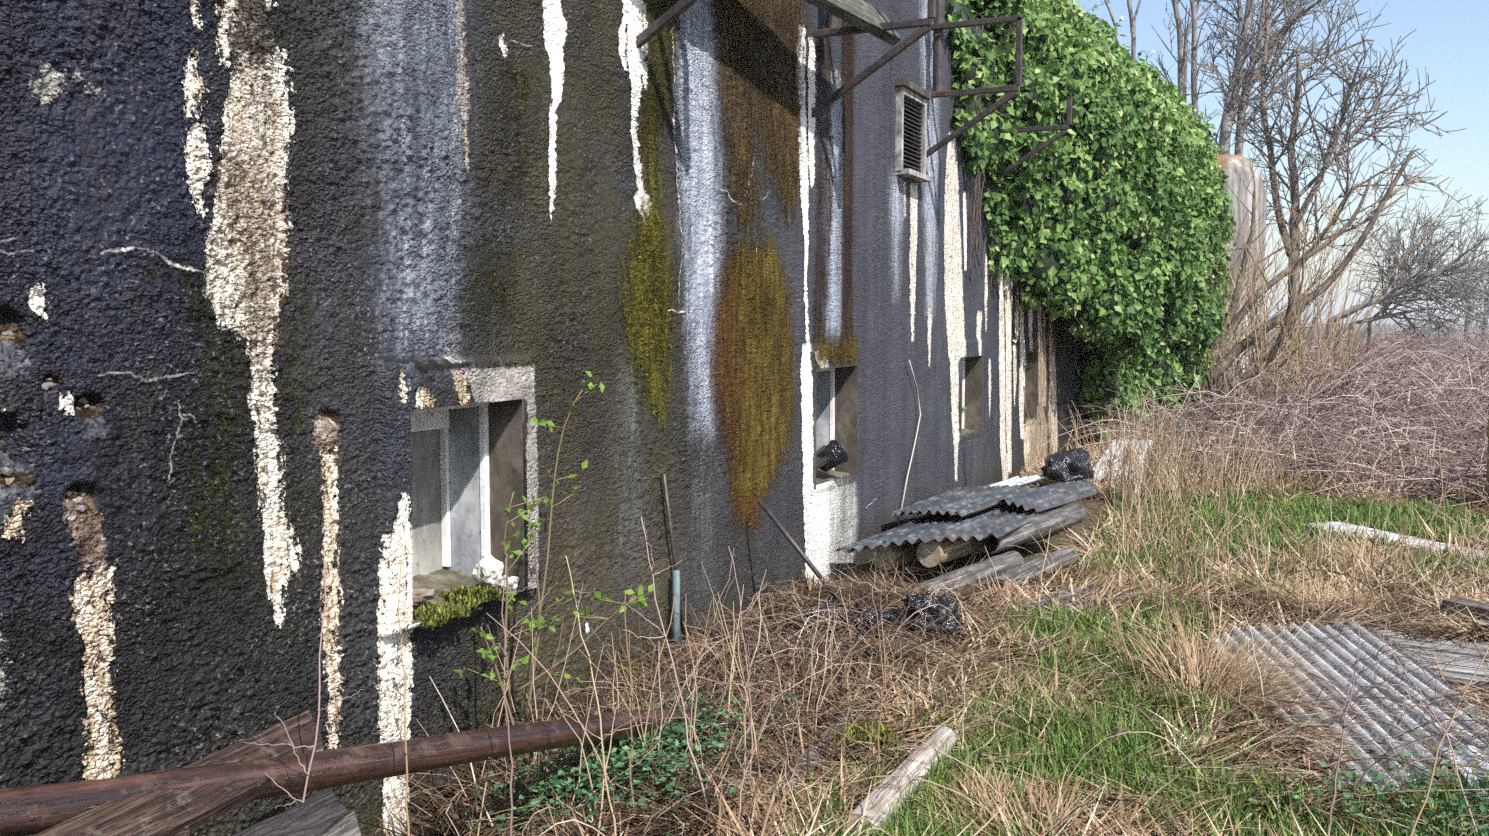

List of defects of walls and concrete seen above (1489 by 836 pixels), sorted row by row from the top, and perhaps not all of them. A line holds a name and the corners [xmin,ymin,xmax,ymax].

spalling [0,283,110,440]
peeling [182,0,303,628]
damp [370,0,468,362]
peeling [542,0,567,222]
peeling [618,0,652,226]
peeling [903,131,1058,481]
peeling [61,481,125,780]
peeling [311,407,344,749]
peeling [373,492,420,743]
peeling [382,776,410,836]